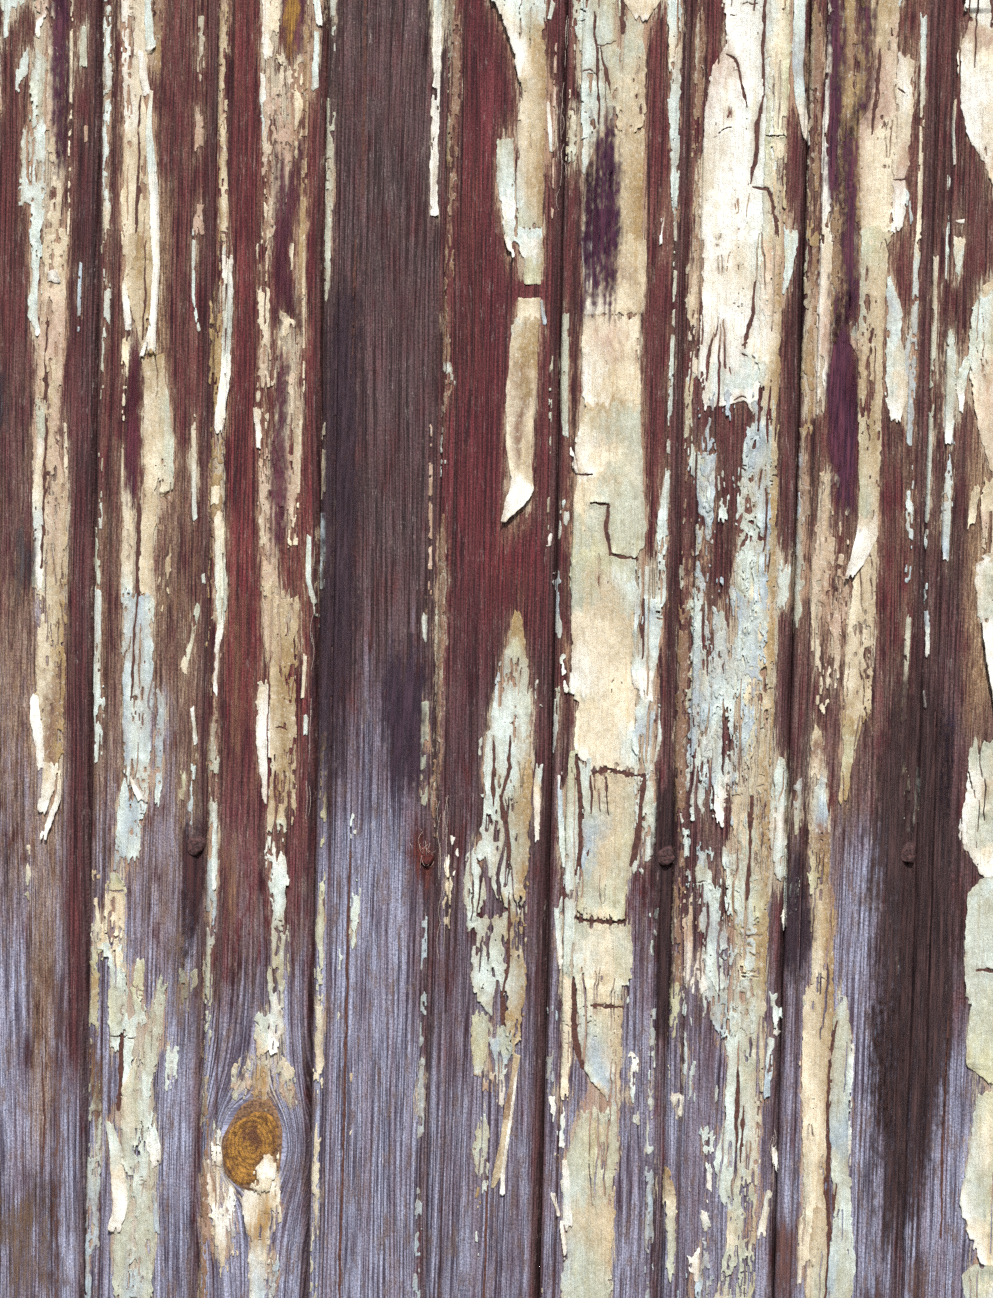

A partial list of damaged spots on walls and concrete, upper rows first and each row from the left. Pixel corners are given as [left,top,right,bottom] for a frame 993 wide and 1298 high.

peeling [0,0,234,1298]
peeling [230,0,337,1111]
crack [577,473,639,561]
peeling [420,0,993,1298]
rust [181,819,207,955]
peeling [313,872,361,1094]
peeling [417,992,427,1139]
peeling [197,1076,282,1298]
peeling [309,1123,321,1298]
peeling [412,1188,422,1298]